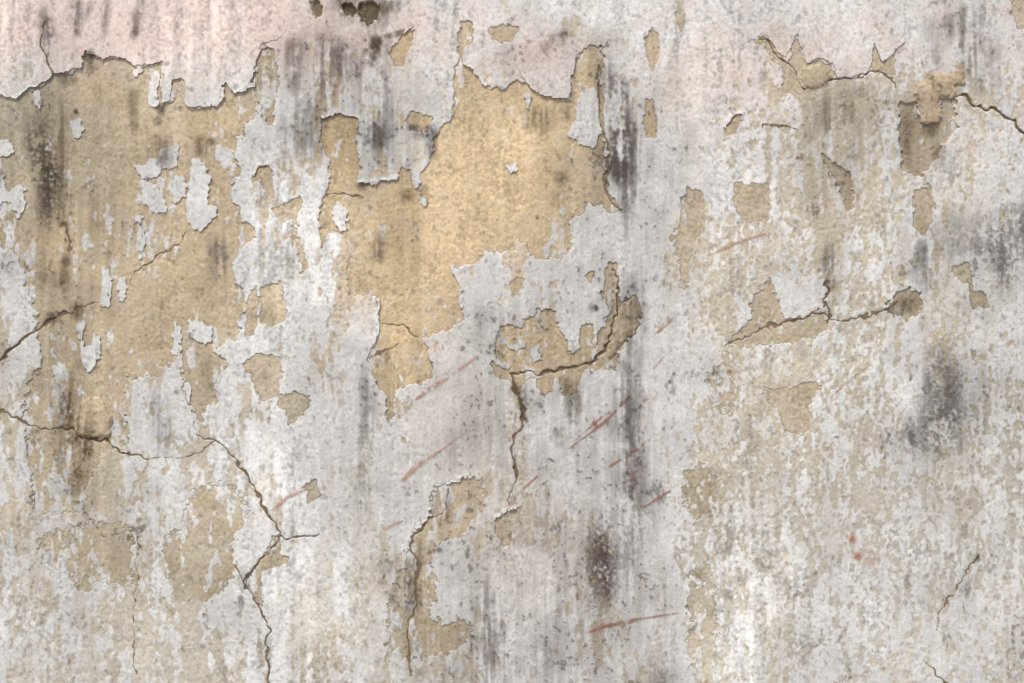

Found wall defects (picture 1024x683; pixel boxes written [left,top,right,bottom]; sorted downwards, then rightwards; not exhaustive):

damp [31,145,62,212]
peeling [0,43,308,605]
peeling [319,20,642,422]
crack [507,268,620,506]
damp [612,122,635,206]
crack [725,279,898,346]
spalling [898,98,957,234]
crack [956,93,1024,134]
crack [0,392,320,683]
crack [406,488,449,676]
peeling [384,470,521,662]
damp [587,539,612,595]